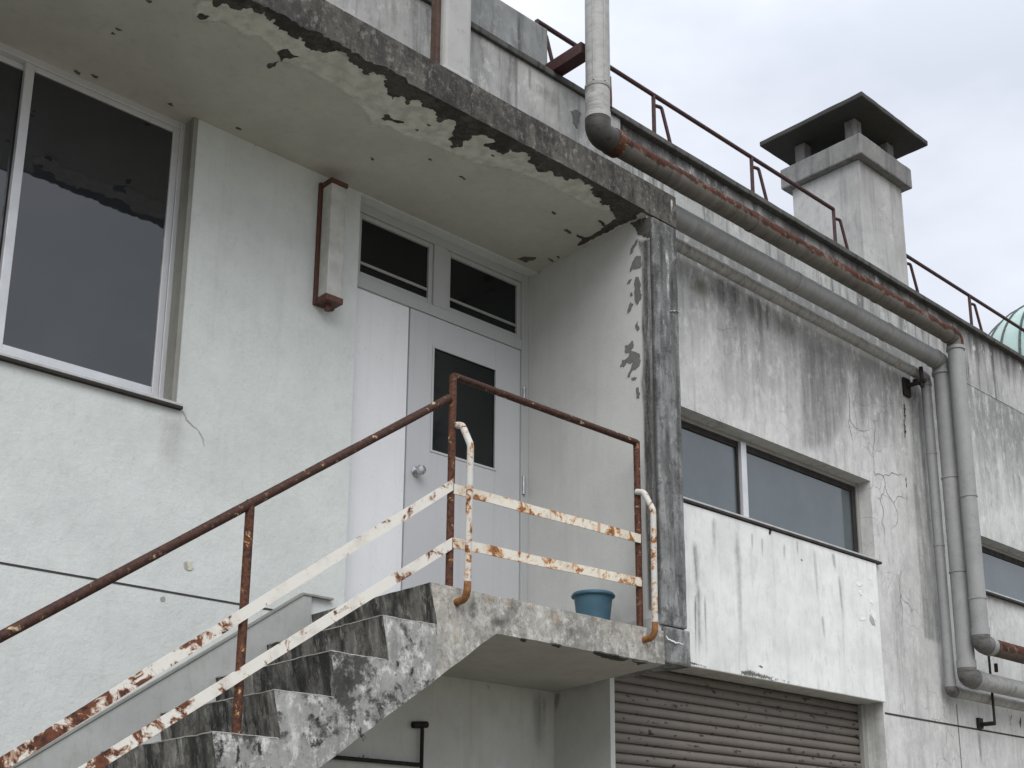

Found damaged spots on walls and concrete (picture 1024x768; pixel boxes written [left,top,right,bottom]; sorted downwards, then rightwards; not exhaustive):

peeling [197,0,651,398]
crack [848,393,907,539]